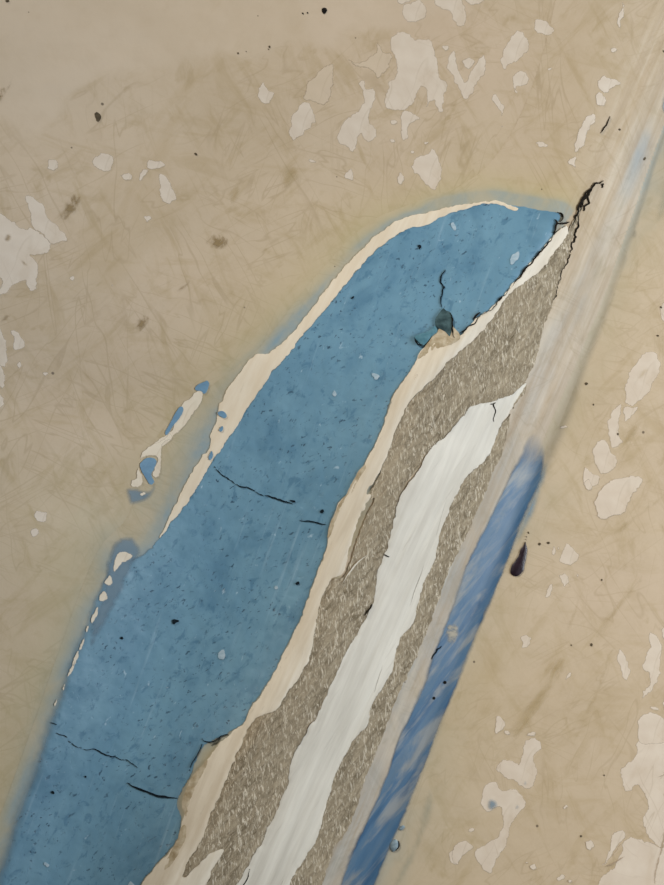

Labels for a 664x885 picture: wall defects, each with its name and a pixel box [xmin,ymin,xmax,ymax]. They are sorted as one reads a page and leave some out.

peeling [337,32,486,152]
peeling [411,142,442,190]
peeling [500,31,529,93]
peeling [568,76,621,167]
crack [438,271,446,307]
crack [459,180,604,334]
peeling [583,352,661,519]
crack [216,469,325,525]
peeling [0,195,585,885]
peeling [642,628,664,698]
crack [52,723,174,798]
peeling [598,702,664,885]